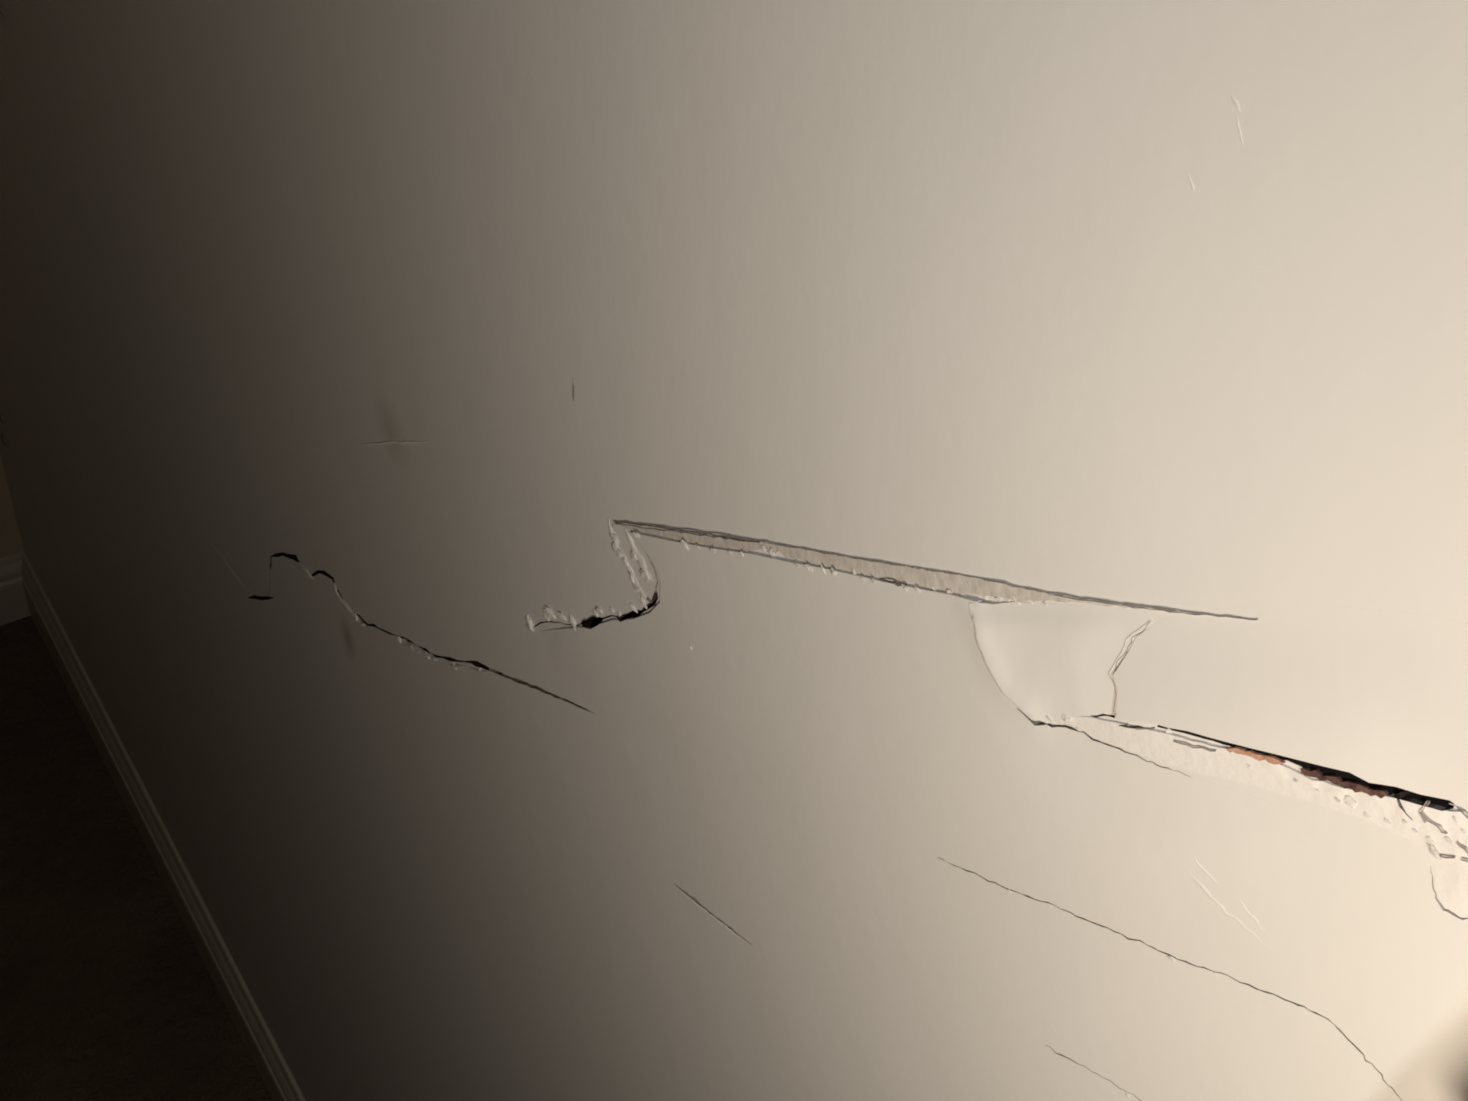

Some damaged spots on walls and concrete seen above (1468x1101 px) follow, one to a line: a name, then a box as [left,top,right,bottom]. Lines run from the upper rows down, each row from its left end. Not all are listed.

crack [207,539,595,714]
crack [526,518,658,632]
peeling [613,520,1468,918]
crack [937,857,1402,1101]